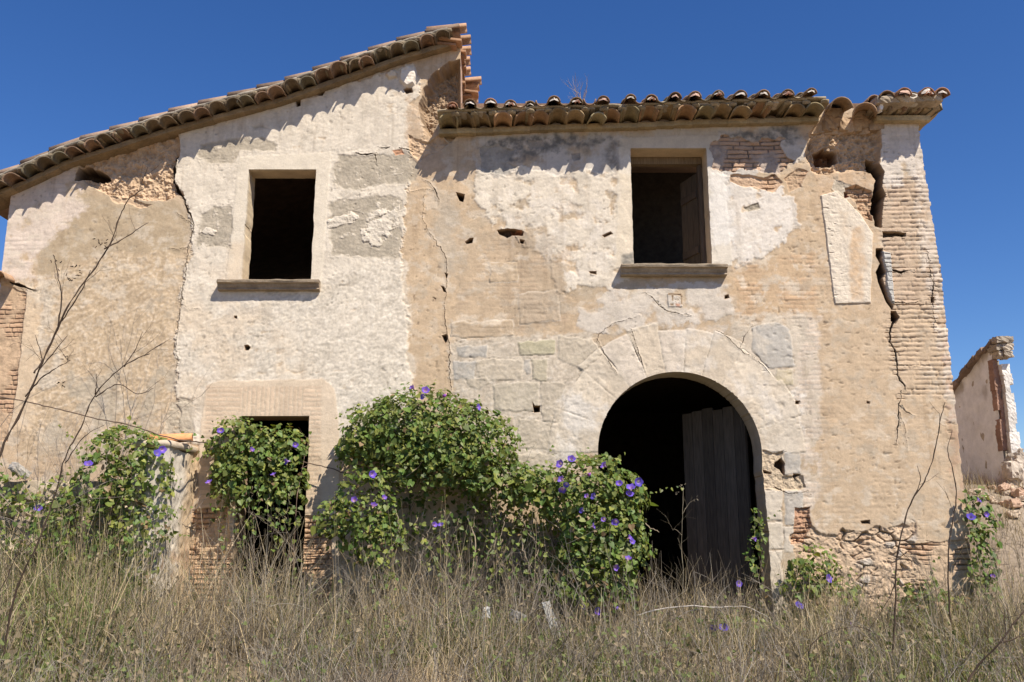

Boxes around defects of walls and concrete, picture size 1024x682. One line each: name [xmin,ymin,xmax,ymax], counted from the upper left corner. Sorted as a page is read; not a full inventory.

spalling [71,121,282,213]
crack [166,154,202,383]
peeling [320,57,464,265]
crack [350,144,455,401]
crack [593,289,774,378]
flaking render [704,112,887,307]
flaking render [762,447,976,634]